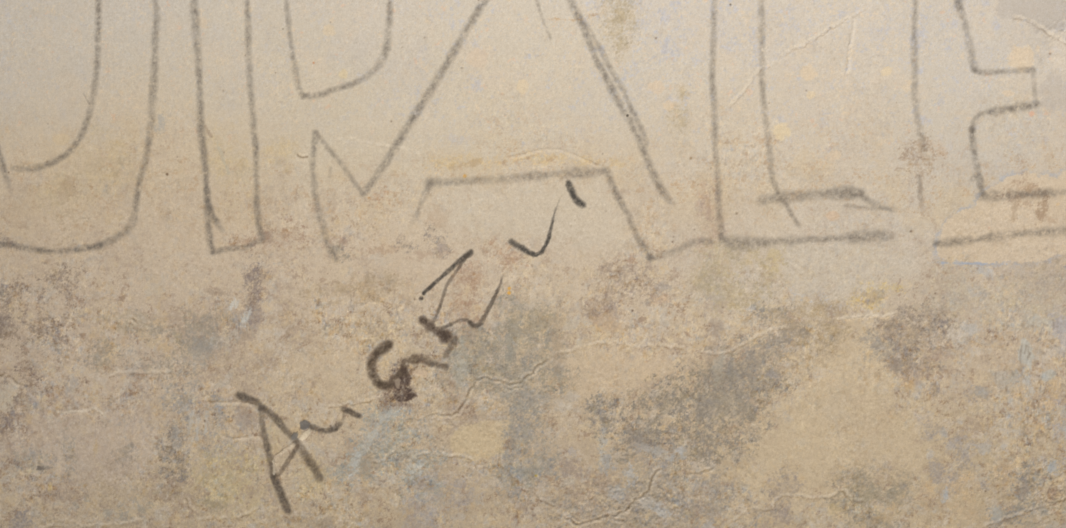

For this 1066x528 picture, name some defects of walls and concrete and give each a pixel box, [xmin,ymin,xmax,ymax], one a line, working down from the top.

crack [425,352,555,420]